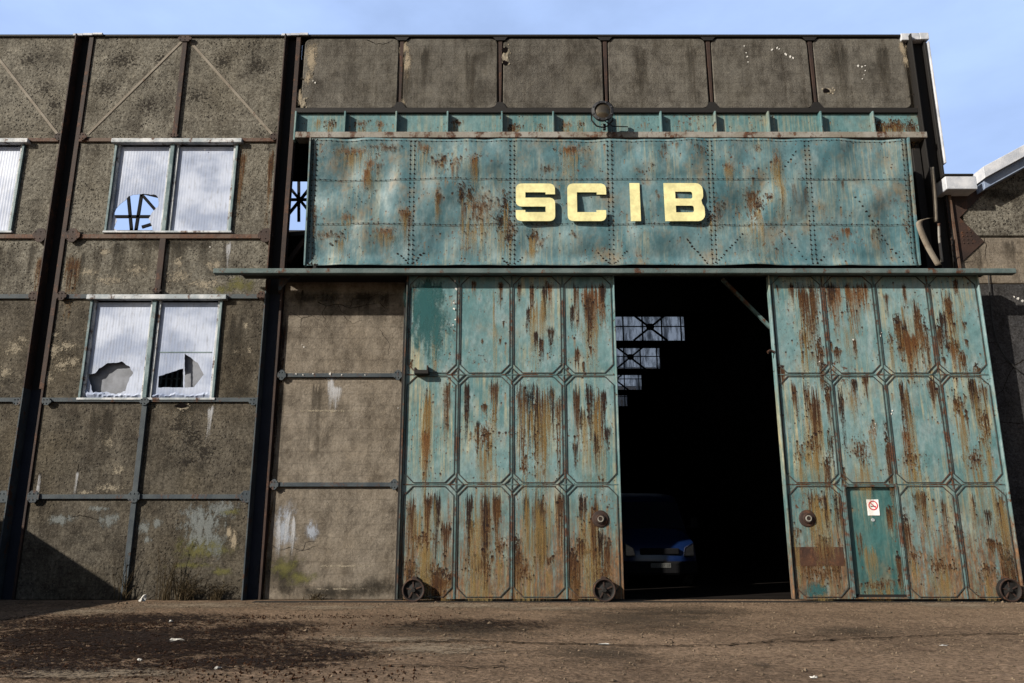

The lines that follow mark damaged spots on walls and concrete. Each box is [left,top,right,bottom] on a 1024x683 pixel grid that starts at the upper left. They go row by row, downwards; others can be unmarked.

corrosion [333,120,402,189]
corrosion [376,207,412,245]
corrosion [417,141,547,255]
corrosion [707,153,808,232]
corrosion [869,119,918,146]
corrosion [402,281,612,601]
corrosion [776,278,1020,601]
peeling [184,500,237,555]